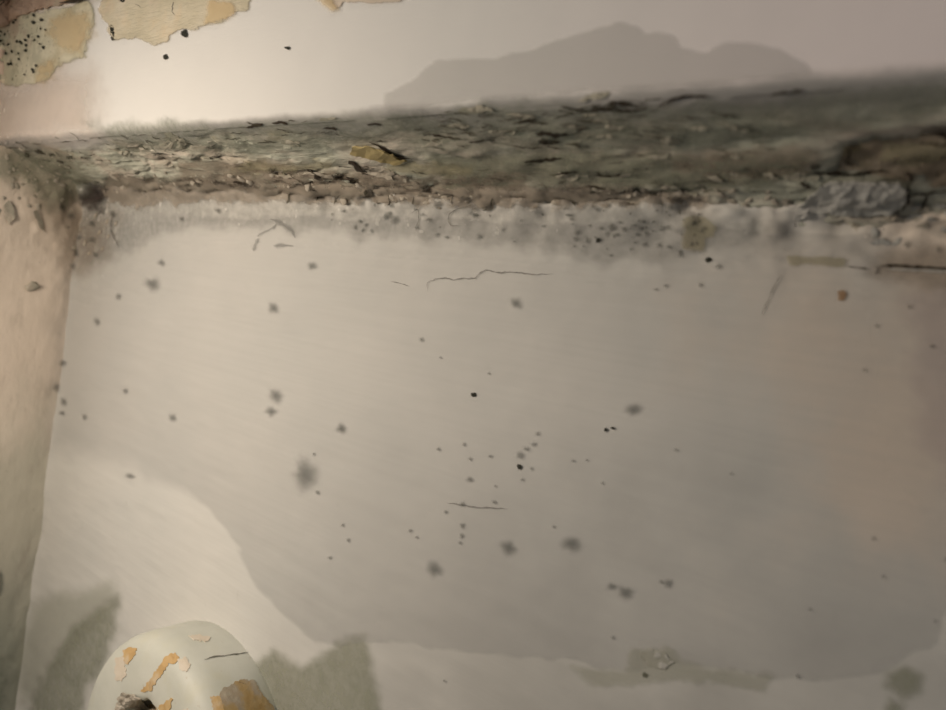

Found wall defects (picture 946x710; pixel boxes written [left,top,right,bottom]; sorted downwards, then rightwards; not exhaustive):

flaking render [0,0,250,87]
flaking render [0,89,946,256]
water stain [434,155,806,206]
crack [395,270,543,289]
crack [848,264,946,274]
peeling [122,647,137,664]
peeling [141,653,191,692]
water stain [258,639,375,710]
peeling [150,698,173,710]
peeling [210,679,275,710]